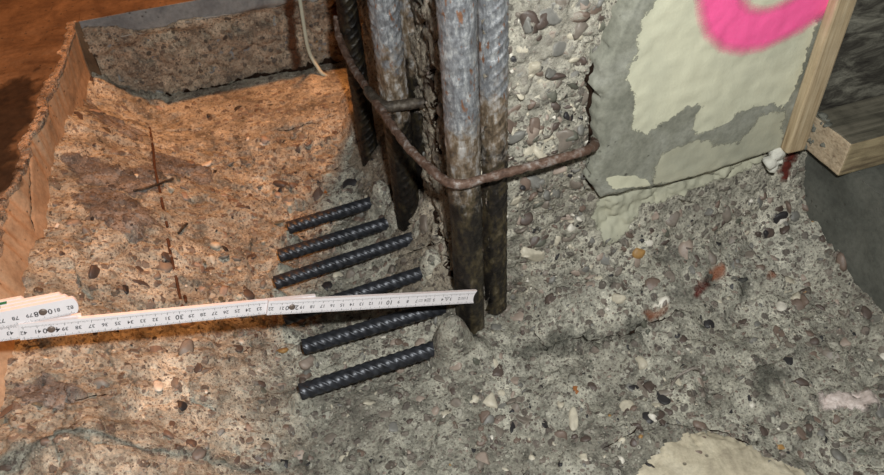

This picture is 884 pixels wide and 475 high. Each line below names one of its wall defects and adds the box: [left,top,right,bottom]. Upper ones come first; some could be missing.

corrosion [285,0,301,71]
crack [165,57,341,96]
spalling [301,0,818,354]
spalling [282,312,324,325]
crack [534,309,685,348]